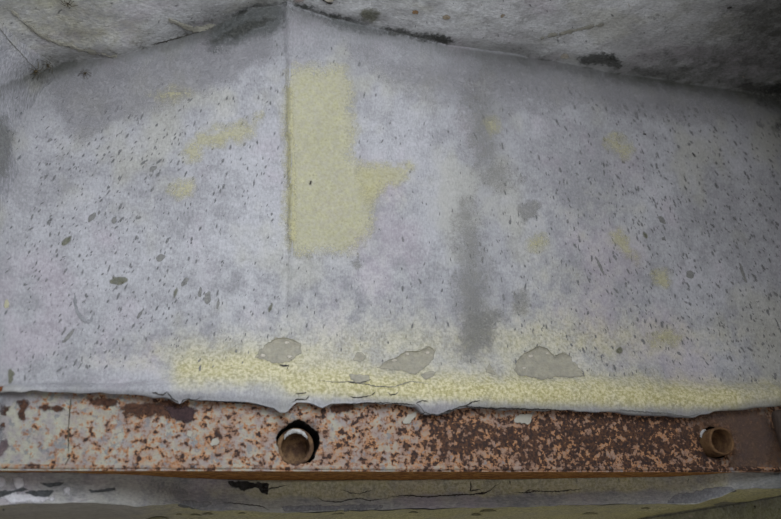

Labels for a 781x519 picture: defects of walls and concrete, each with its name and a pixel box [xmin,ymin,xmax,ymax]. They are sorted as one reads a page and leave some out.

leakage [210,4,284,52]
leakage [294,4,452,45]
spalling [510,85,781,382]
spalling [235,326,311,363]
spalling [377,342,442,379]
rust [0,399,29,456]
rust [86,397,198,423]
rust [331,404,354,413]
crack [293,379,565,416]
peeling [514,414,532,424]
rust [690,410,777,468]